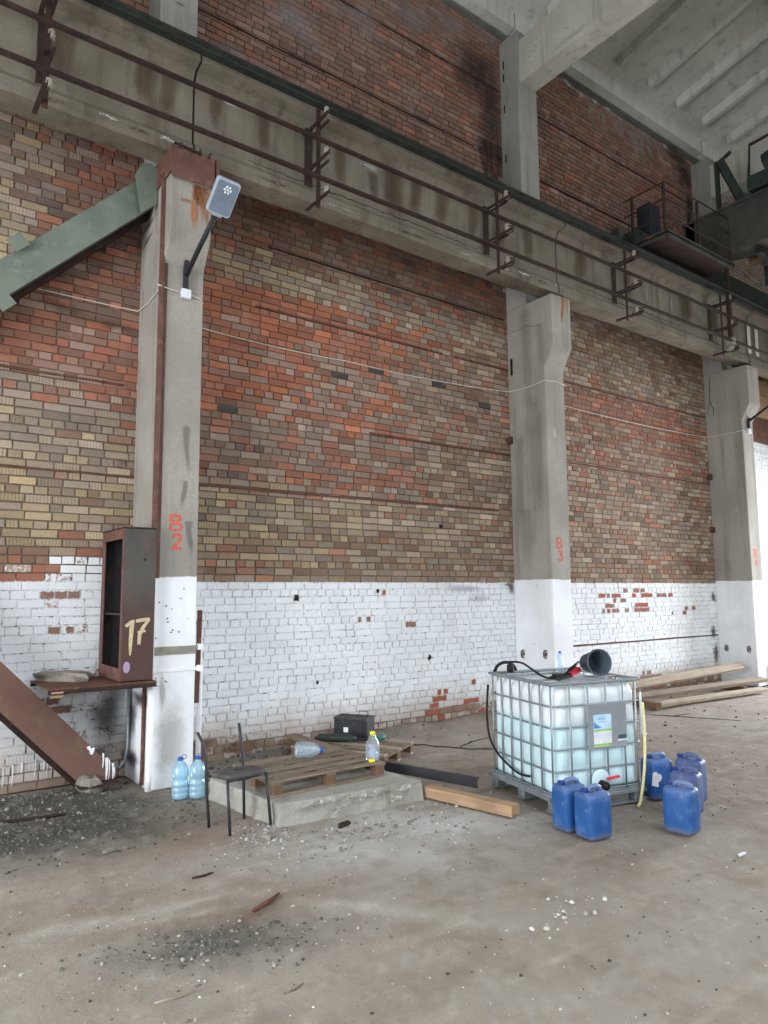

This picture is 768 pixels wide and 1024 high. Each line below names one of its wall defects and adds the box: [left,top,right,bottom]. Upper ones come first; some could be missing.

leakage [465,58,503,180]
corrosion [185,185,210,221]
peeling [40,591,80,599]
peeling [599,588,673,613]
peeling [48,626,74,634]
peeling [426,679,489,720]